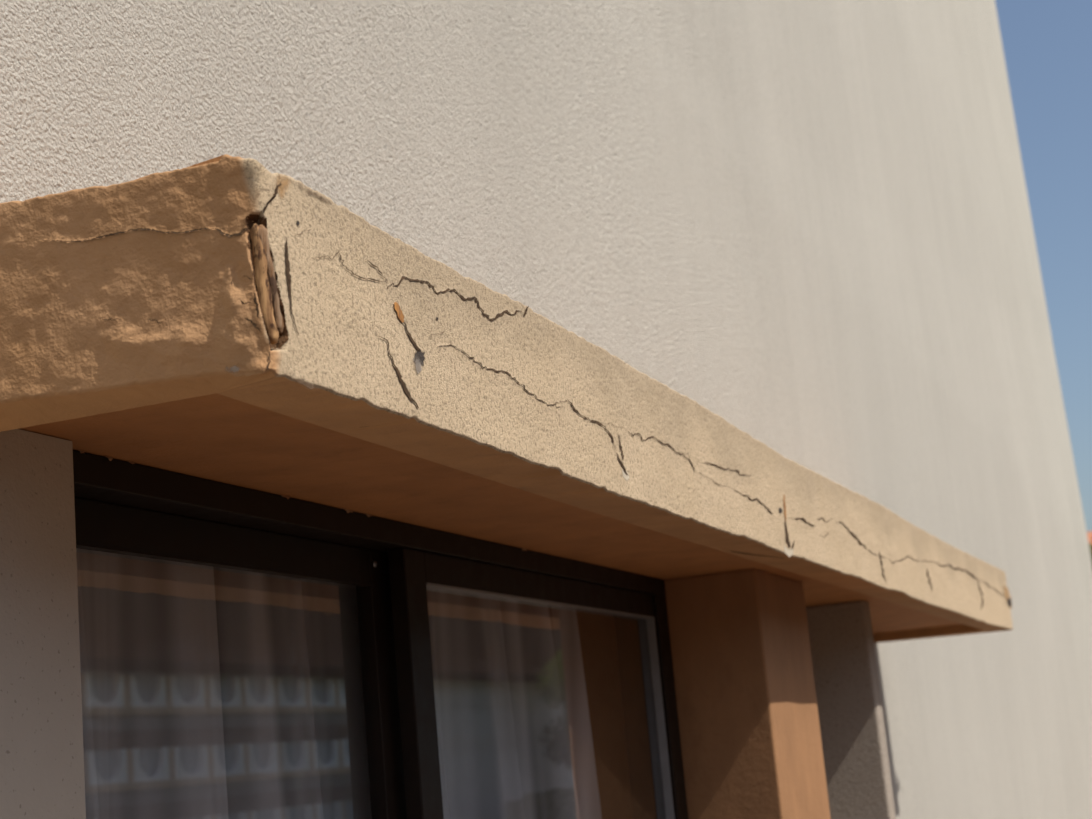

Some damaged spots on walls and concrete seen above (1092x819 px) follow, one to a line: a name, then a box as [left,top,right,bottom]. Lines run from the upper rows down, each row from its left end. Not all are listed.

crack [41,183,282,242]
crack [231,277,270,370]
crack [285,229,529,335]
crack [380,336,419,409]
crack [434,332,1002,610]